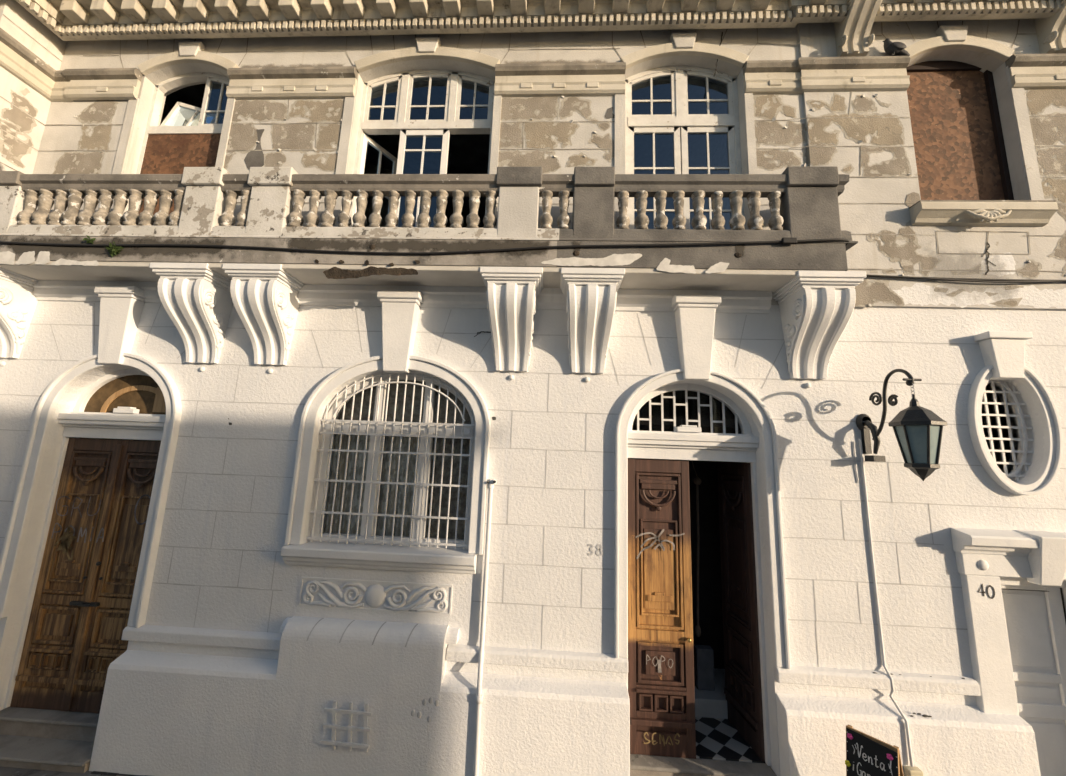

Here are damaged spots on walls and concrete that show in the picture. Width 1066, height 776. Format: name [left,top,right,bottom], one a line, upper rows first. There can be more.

peeling [0,88,38,169]
peeling [52,100,118,174]
peeling [223,99,345,172]
peeling [498,95,615,174]
peeling [753,93,912,178]
peeling [985,89,1066,307]
spalling [315,244,420,279]
peeling [854,220,981,307]
crack [981,242,996,275]